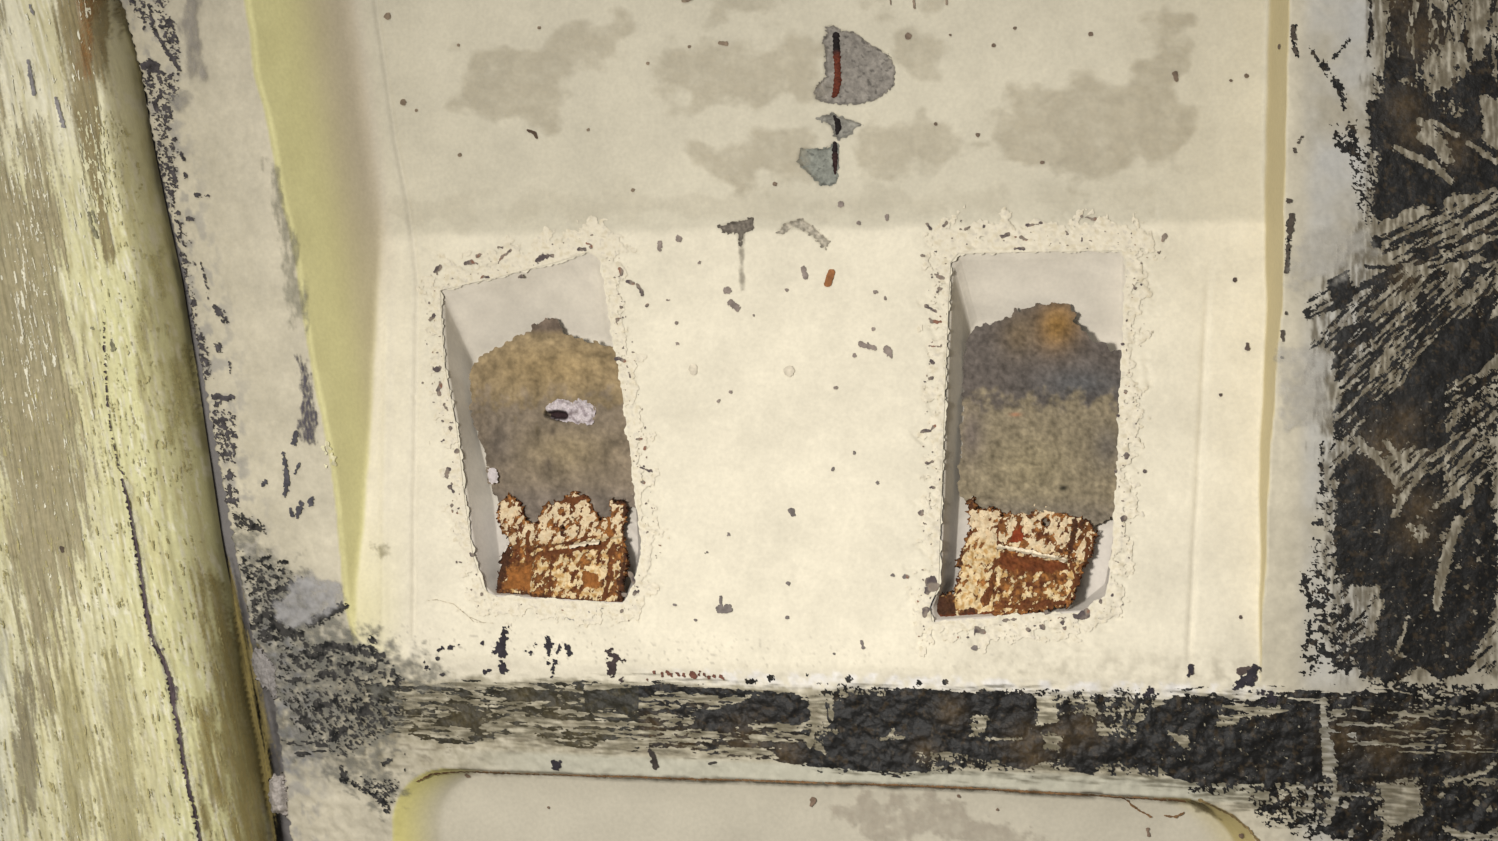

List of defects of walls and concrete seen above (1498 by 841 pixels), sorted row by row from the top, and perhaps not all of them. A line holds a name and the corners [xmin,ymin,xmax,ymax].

crack [102,322,203,841]
water stain [129,0,440,841]
peeling [364,0,1498,841]